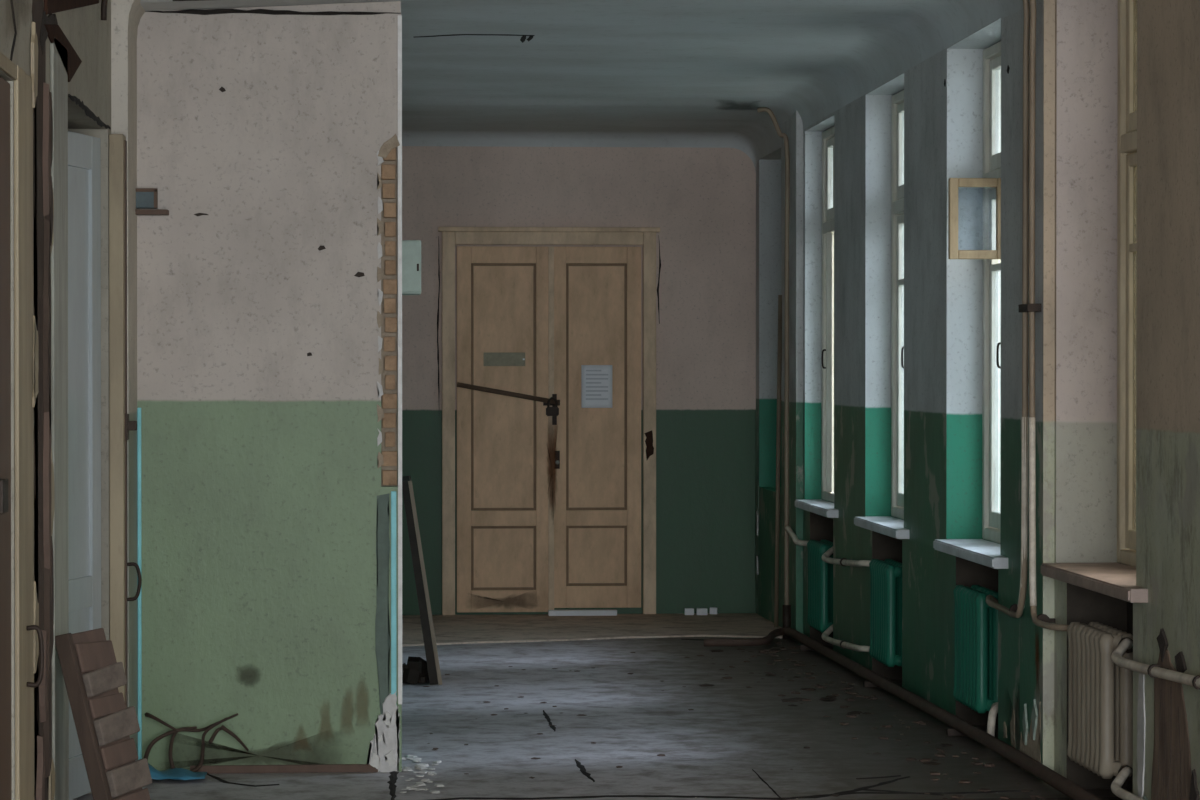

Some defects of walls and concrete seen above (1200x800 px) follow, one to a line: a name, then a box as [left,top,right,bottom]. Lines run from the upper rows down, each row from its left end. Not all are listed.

flaking render [31,0,58,800]
flaking render [354,134,400,772]
flaking render [1137,628,1200,800]